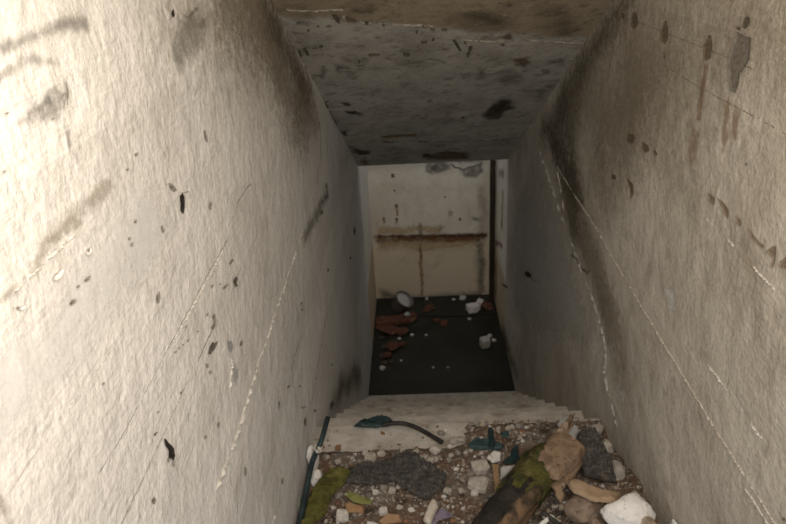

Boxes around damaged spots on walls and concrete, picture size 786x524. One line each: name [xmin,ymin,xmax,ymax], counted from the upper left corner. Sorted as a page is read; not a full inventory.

damp [174,0,309,127]
damp [483,100,514,119]
corrosion [377,233,487,293]